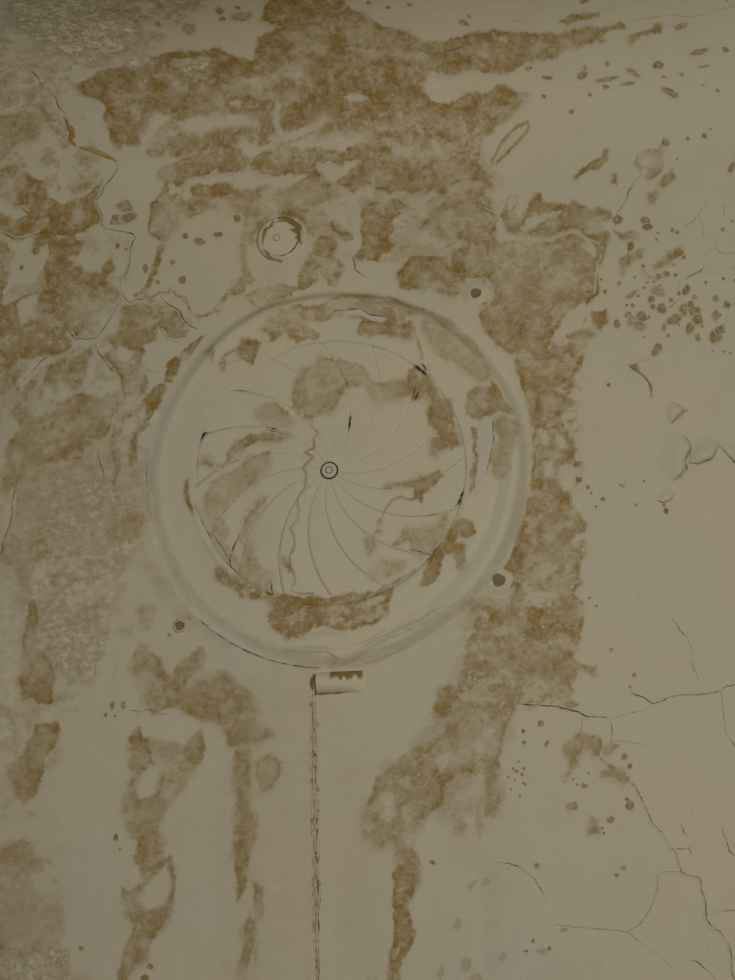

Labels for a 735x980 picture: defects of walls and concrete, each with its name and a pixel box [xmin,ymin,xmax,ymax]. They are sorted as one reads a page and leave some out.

damp [570,146,619,186]
damp [632,138,679,206]
crack [65,160,200,366]
damp [624,244,704,342]
damp [708,294,731,352]
damp [182,293,522,643]
damp [330,671,362,679]
crack [523,702,612,741]
crack [631,684,735,704]
damp [115,640,285,980]
damp [0,835,95,980]
crack [631,786,735,980]